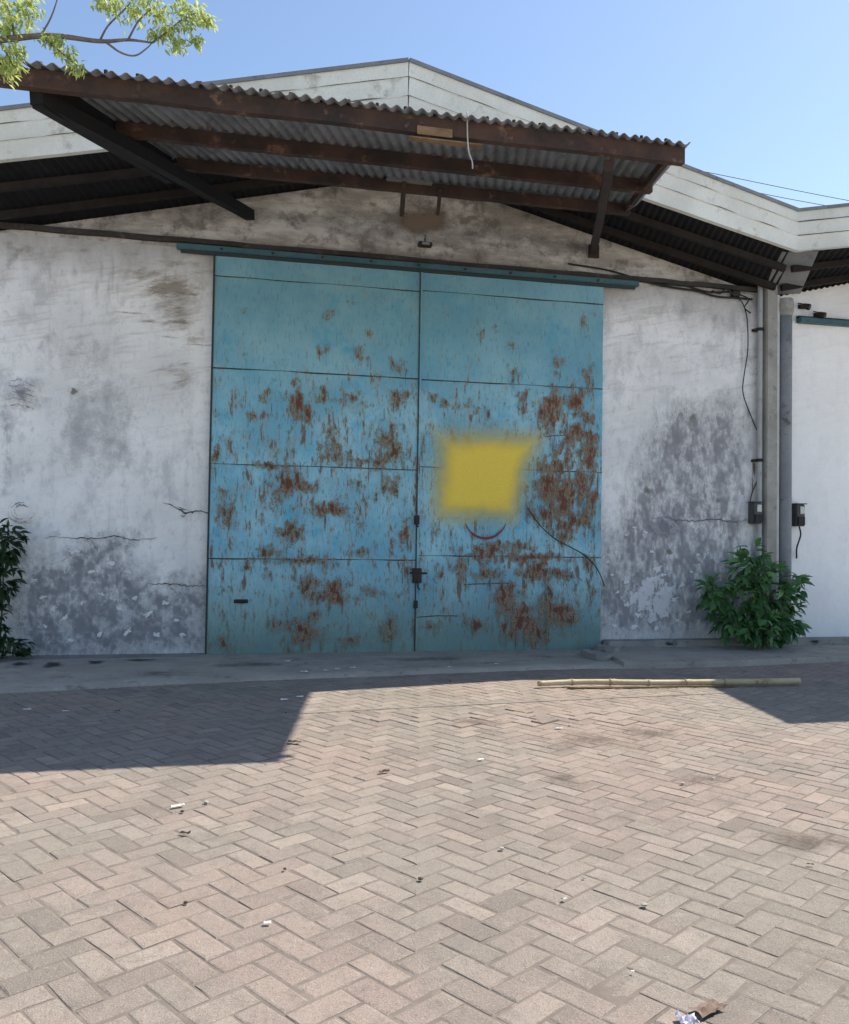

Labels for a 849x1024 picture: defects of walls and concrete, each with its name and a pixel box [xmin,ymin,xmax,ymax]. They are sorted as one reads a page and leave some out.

crack [48,535,154,549]
water stain [18,538,204,655]
crack [165,503,208,517]
corrosion [210,443,237,531]
corrosion [243,460,401,653]
corrosion [246,357,491,504]
corrosion [399,516,412,588]
corrosion [433,350,601,650]
peeling [605,549,693,631]
water stain [600,400,746,636]